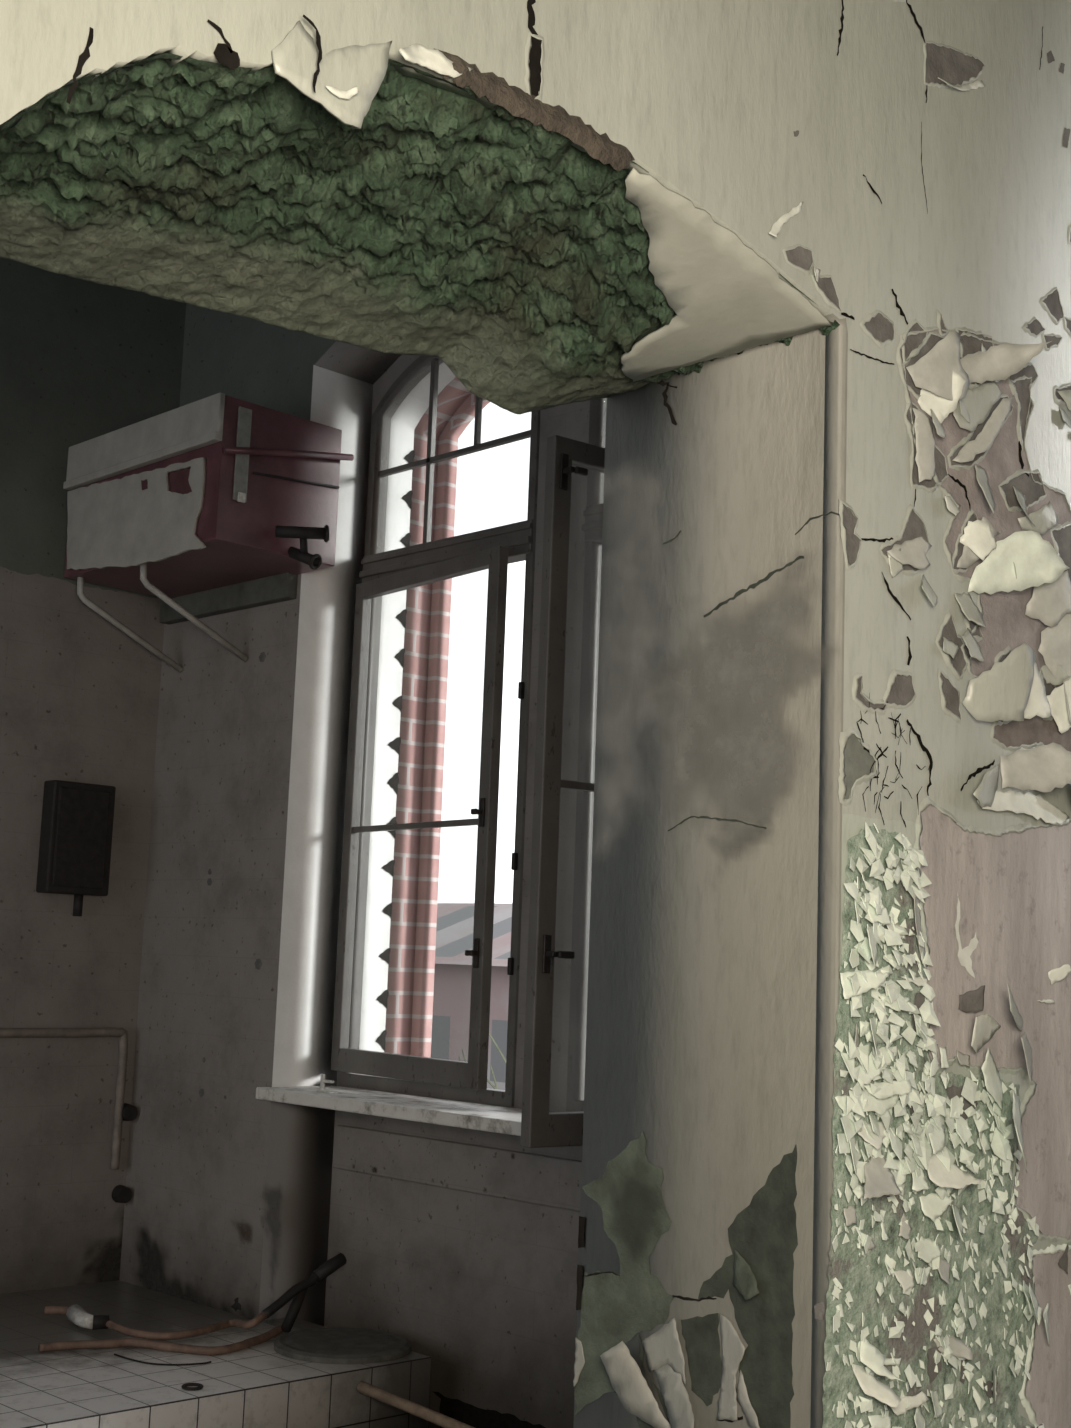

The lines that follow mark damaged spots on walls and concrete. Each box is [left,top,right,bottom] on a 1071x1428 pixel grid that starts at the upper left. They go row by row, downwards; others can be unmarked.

crack [524,0,545,102]
spalling [1039,26,1065,74]
spalling [0,14,840,415]
peeling [782,244,1071,1428]
peeling [573,1132,798,1428]